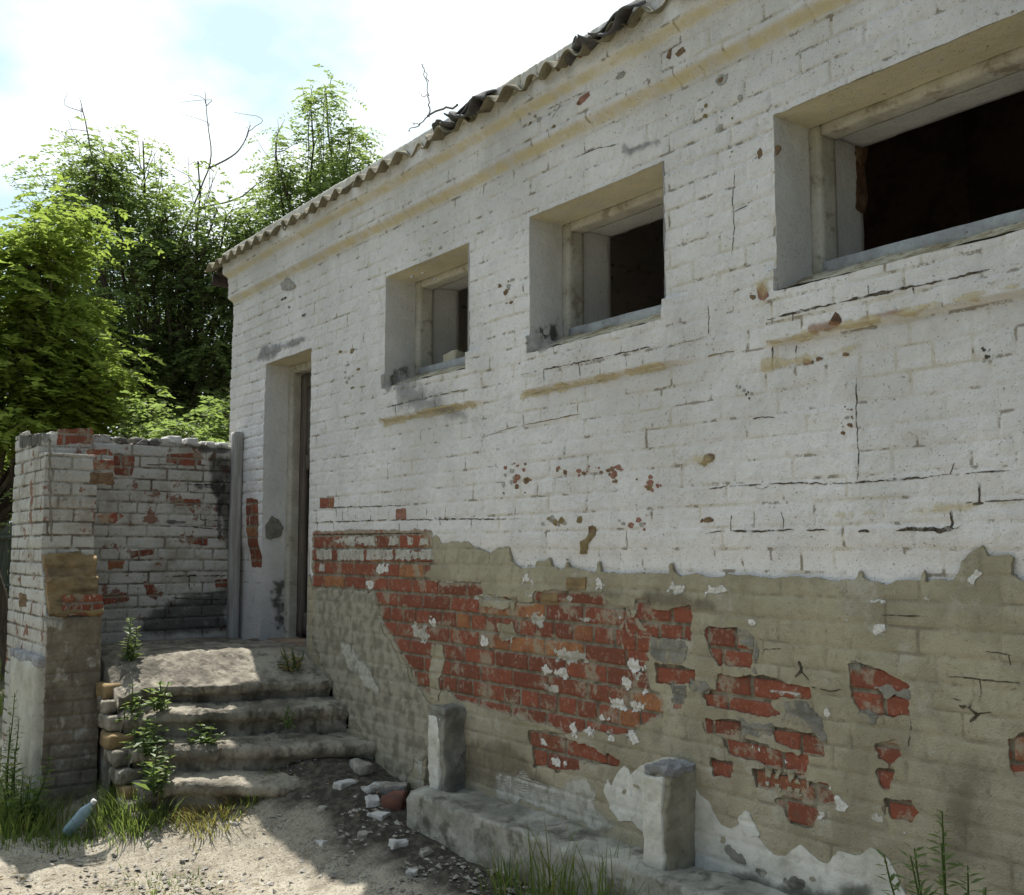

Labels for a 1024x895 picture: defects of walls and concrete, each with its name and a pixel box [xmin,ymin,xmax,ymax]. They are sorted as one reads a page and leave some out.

crack [732,176,748,250]
crack [768,269,989,368]
damp [195,457,230,546]
flaking render [246,498,284,568]
peeling [501,463,532,494]
peeling [556,464,623,483]
peeling [635,475,662,492]
crack [706,385,1024,534]
spalling [41,548,155,630]
peeling [307,508,1024,895]